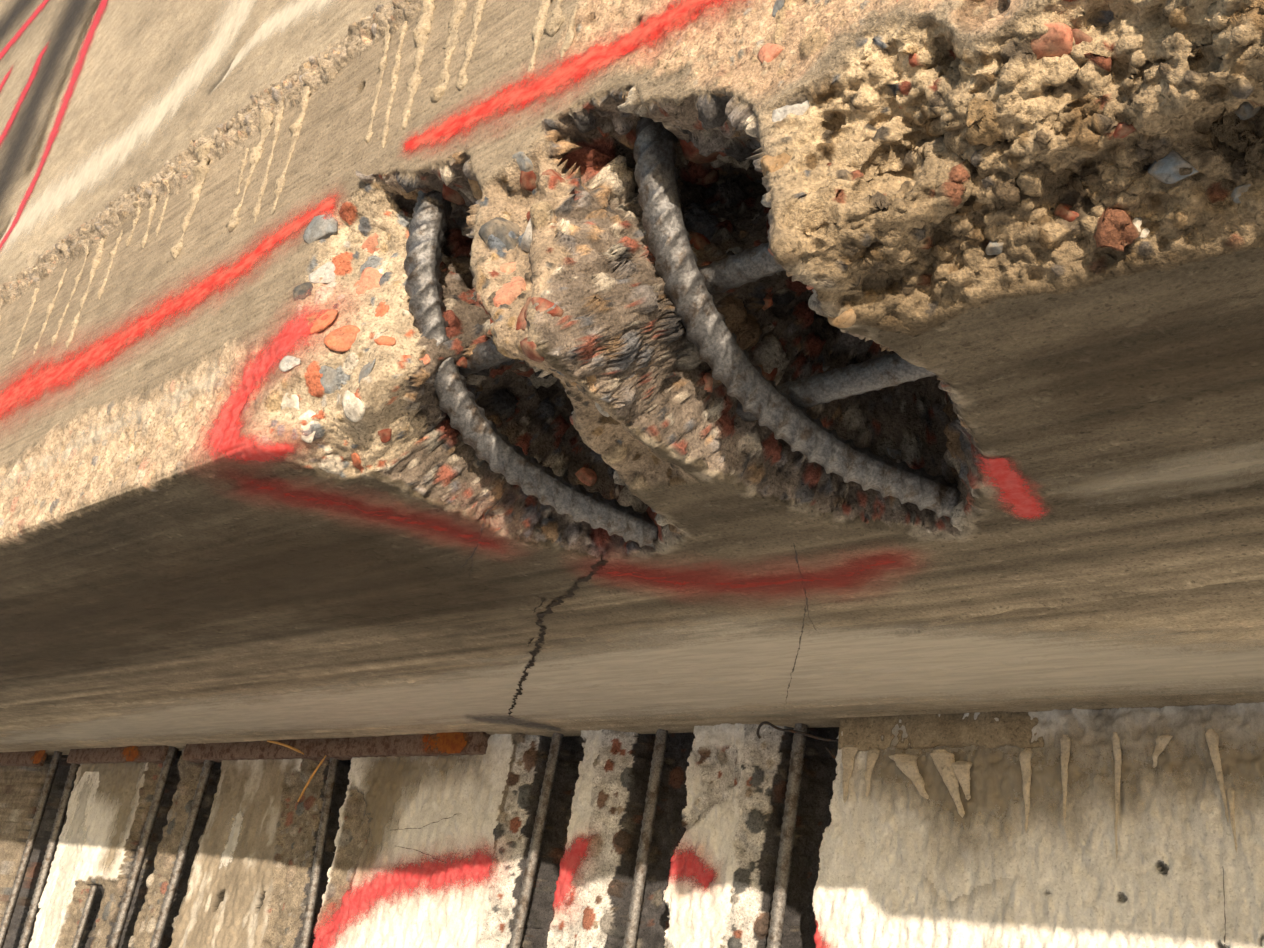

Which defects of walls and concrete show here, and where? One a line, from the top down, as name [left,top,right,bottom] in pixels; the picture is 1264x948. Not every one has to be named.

leakage [0,0,331,252]
spalling [0,0,1264,560]
crack [508,555,608,720]
spalling [0,751,80,948]
spalling [55,746,181,948]
spalling [150,760,224,948]
spalling [508,733,564,948]
spalling [547,899,575,948]
spalling [622,729,668,948]
spalling [681,745,742,836]
spalling [766,723,807,948]
leakage [873,731,1264,839]